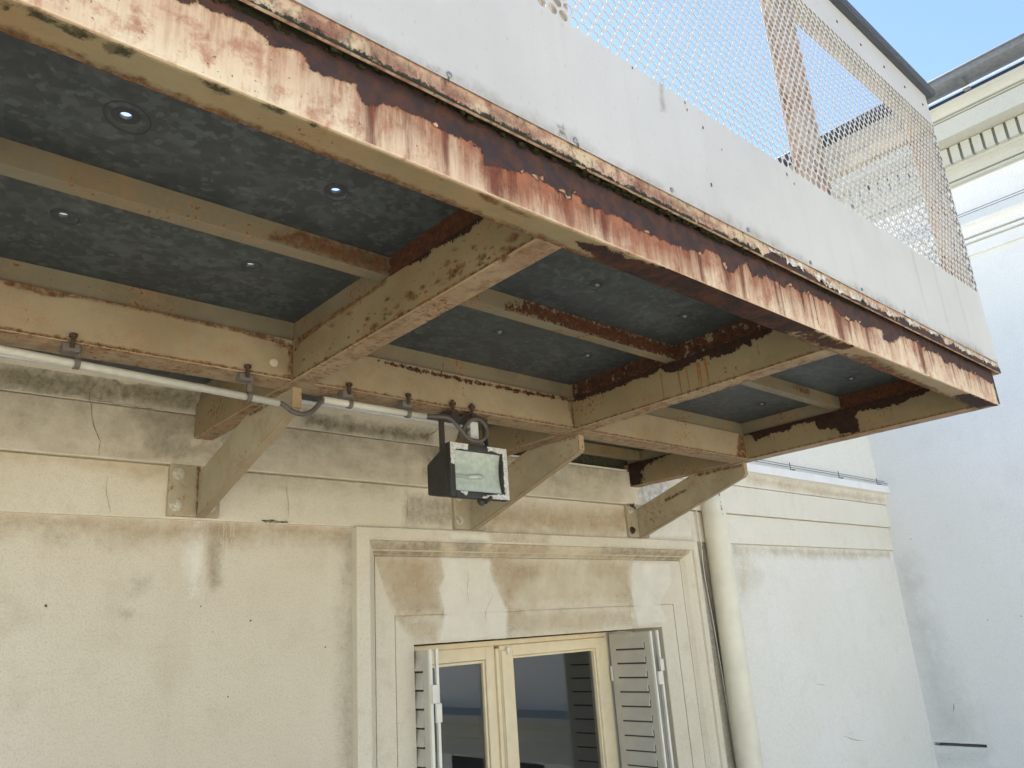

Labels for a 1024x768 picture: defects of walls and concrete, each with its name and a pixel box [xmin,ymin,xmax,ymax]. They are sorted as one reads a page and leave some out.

corrosion [0,0,998,487]
peeling [724,236,1001,373]
crack [89,377,169,507]
water stain [394,555,524,643]
water stain [630,560,672,627]